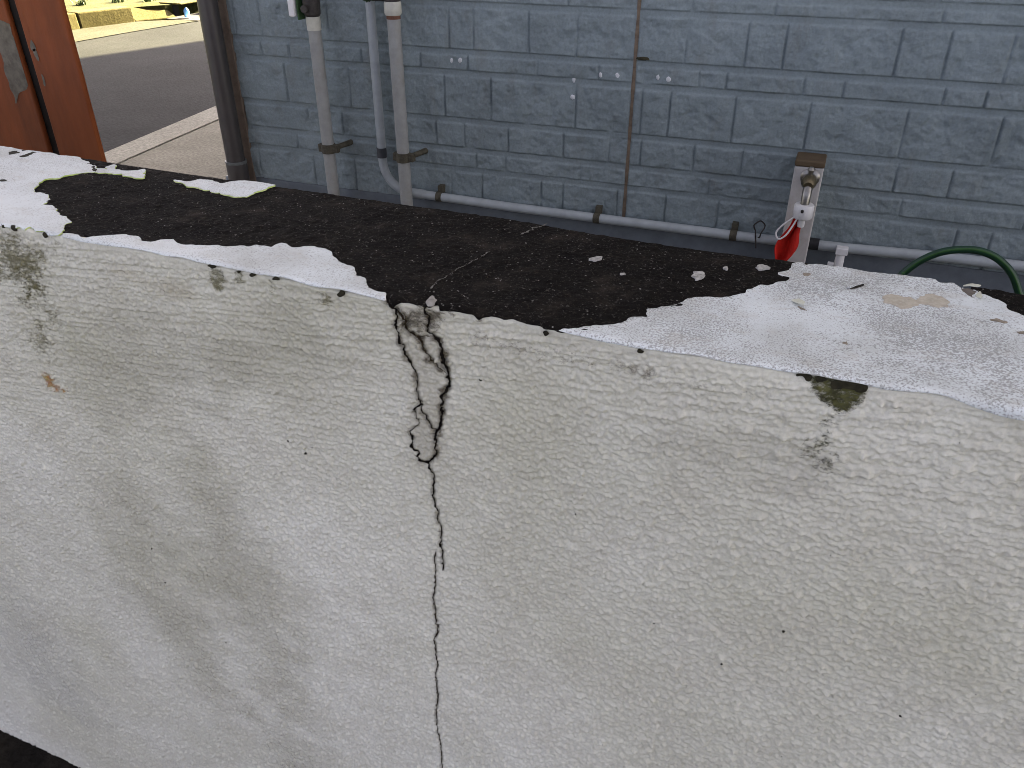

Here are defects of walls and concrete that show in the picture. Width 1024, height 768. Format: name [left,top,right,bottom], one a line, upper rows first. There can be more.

peeling [34,158,808,336]
crack [386,252,490,768]